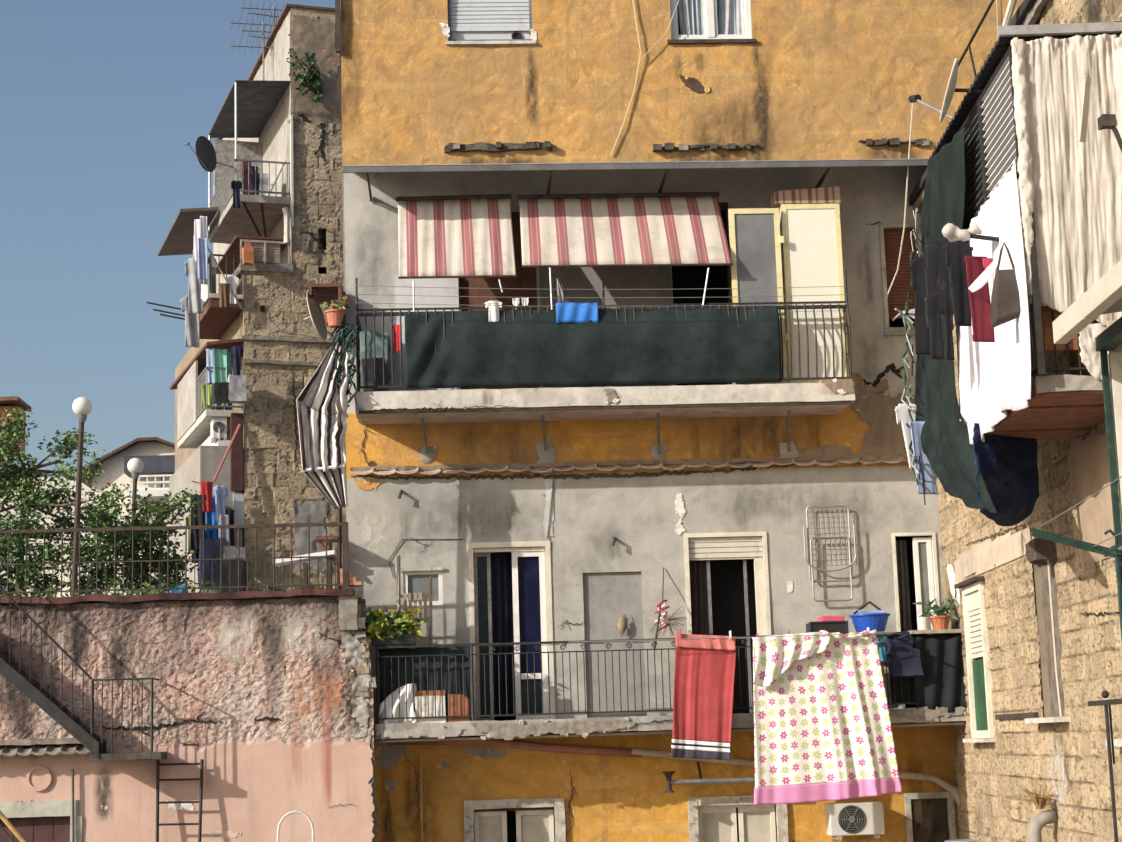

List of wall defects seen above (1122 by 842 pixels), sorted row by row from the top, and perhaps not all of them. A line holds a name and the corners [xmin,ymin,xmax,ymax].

flaking render [679,75,710,93]
crack [289,114,326,162]
flaking render [780,373,915,467]
flaking render [675,493,686,535]
water stain [220,623,253,661]
water stain [285,621,325,652]
crack [103,712,221,747]
crack [254,715,281,723]